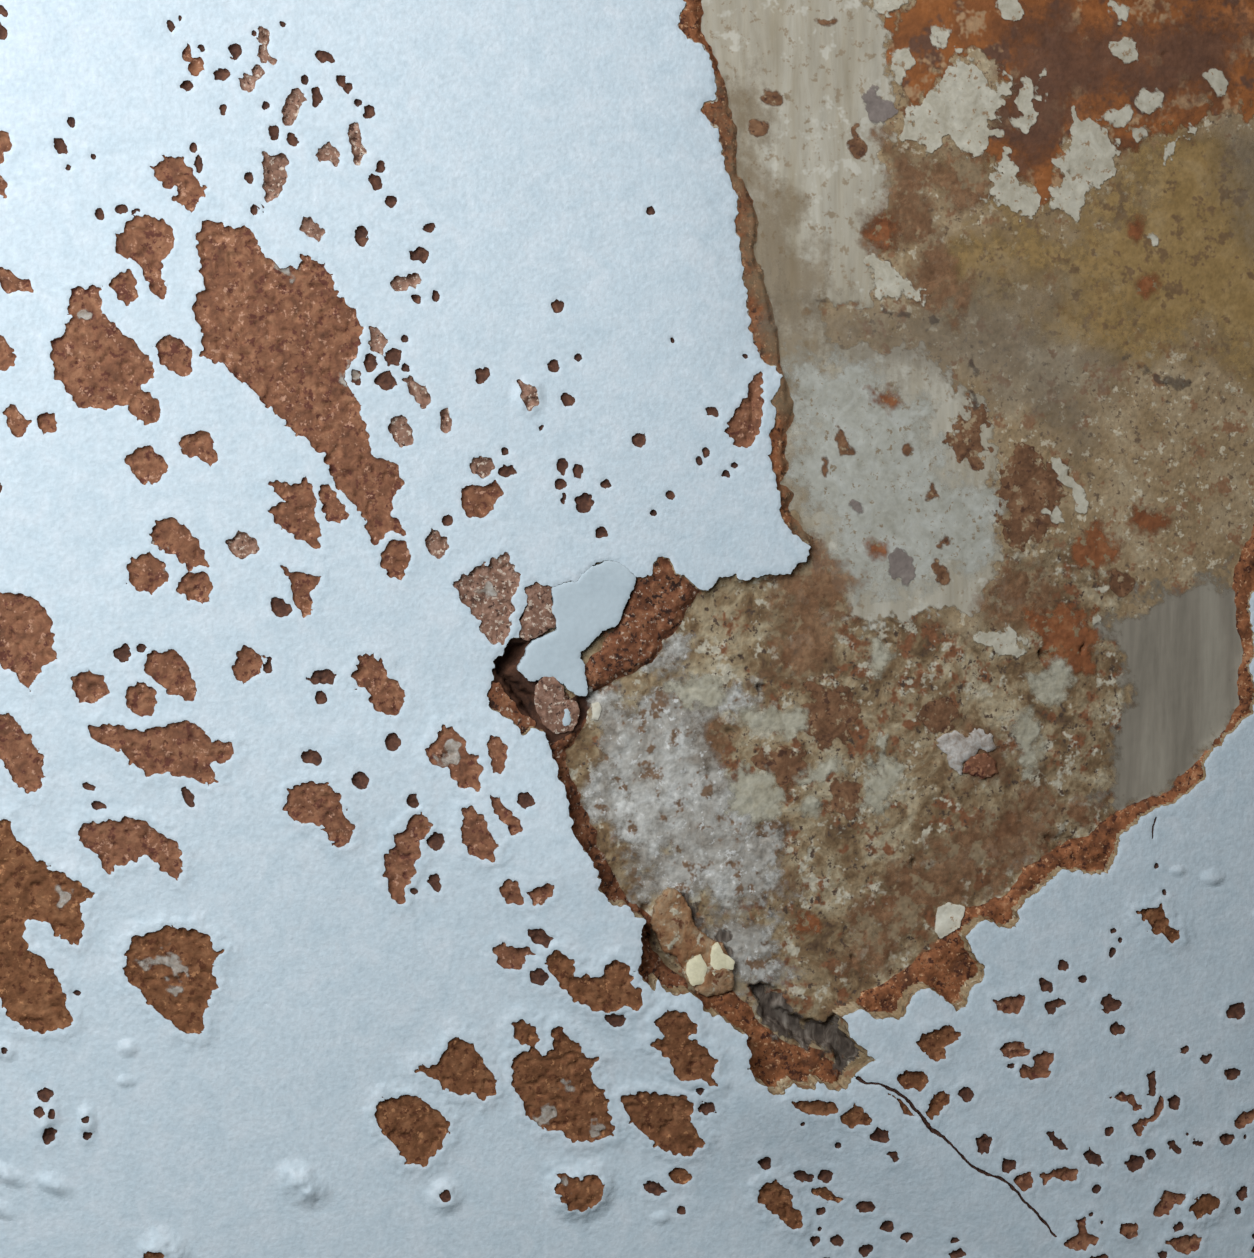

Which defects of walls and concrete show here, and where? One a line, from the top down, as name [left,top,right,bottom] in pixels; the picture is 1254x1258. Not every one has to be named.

peeling [315,50,397,208]
rust [749,119,769,137]
rust [760,89,783,106]
rust [847,0,1254,326]
spalling [50,75,452,580]
spalling [0,592,57,692]
spalling [414,0,1254,1196]
spalling [88,643,234,807]
spalling [0,819,95,1034]
spalling [122,925,224,1034]
spalling [374,1094,450,1167]
crack [856,1076,1057,1237]